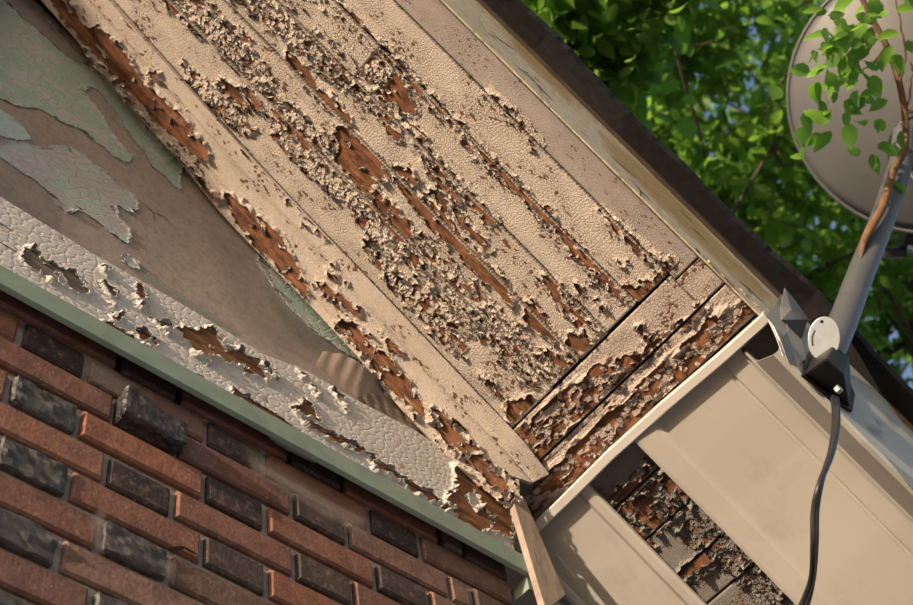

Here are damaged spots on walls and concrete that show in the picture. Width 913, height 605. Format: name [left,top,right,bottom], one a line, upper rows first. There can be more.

peeling [0,0,760,544]
peeling [603,454,787,605]